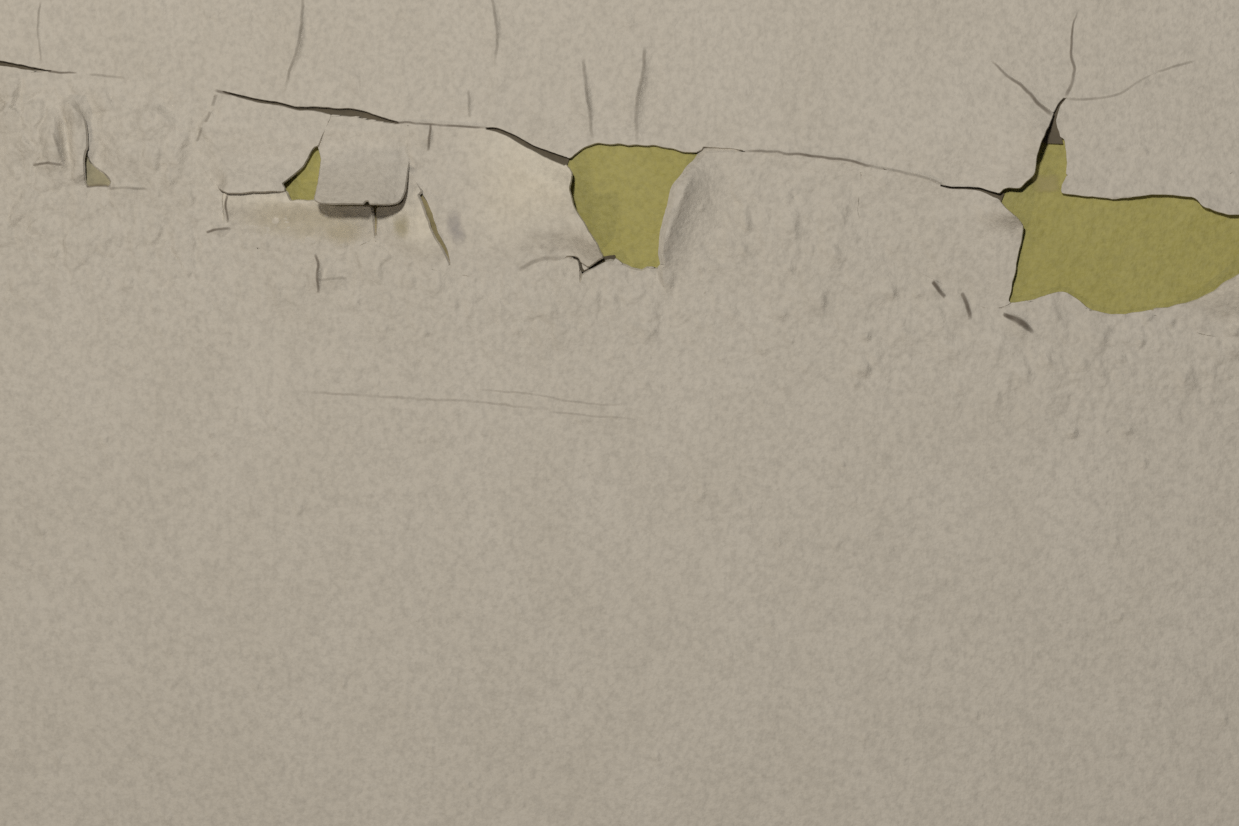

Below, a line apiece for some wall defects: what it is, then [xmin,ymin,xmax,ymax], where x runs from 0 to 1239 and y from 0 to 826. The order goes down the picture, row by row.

crack [0,61,65,73]
peeling [0,70,110,194]
crack [225,92,402,123]
crack [451,125,569,165]
crack [800,153,860,163]
crack [1033,98,1065,144]
crack [371,205,380,231]
crack [420,194,450,261]
peeling [196,91,743,302]
crack [941,185,1004,201]
peeling [858,62,1239,341]
crack [573,255,616,274]